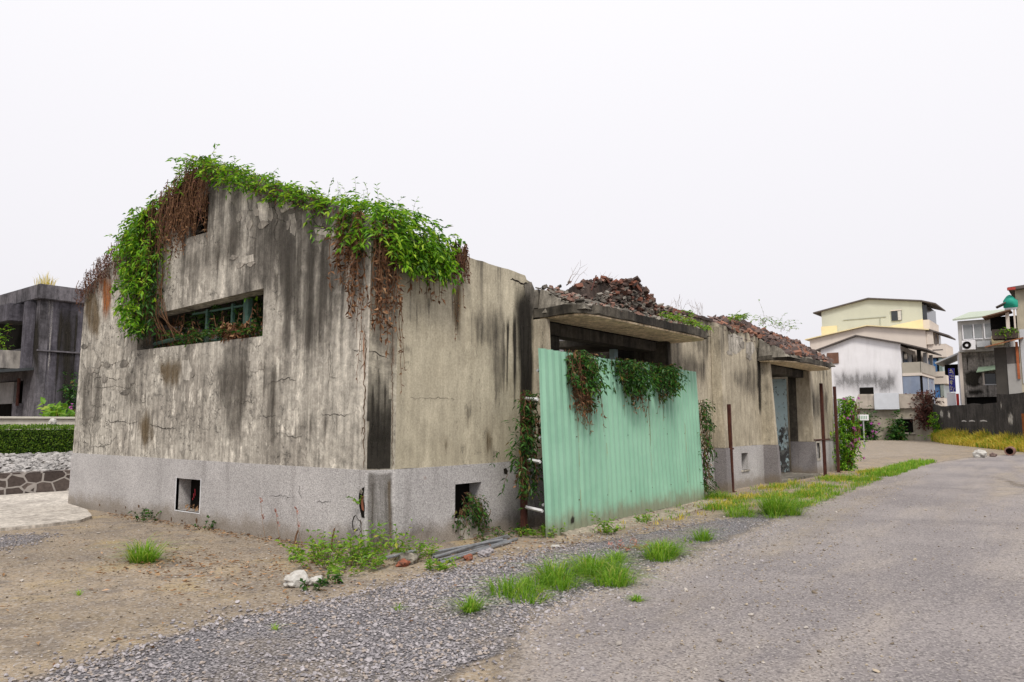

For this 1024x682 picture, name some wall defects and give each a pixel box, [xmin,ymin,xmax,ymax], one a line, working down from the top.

rust [99,275,110,312]
crack [80,350,173,452]
damp [493,294,533,431]
damp [837,375,894,389]
damp [367,386,392,547]